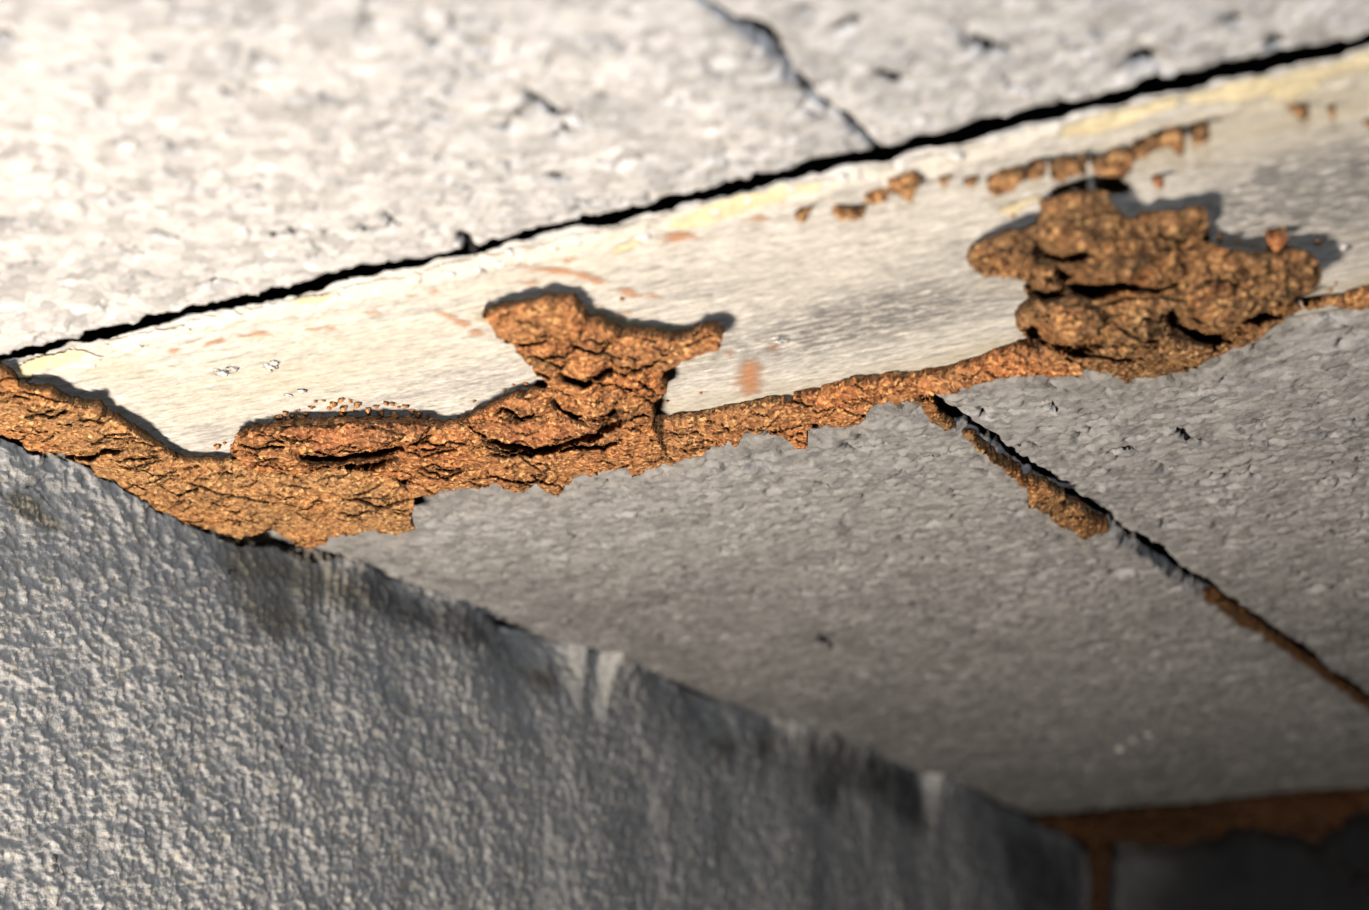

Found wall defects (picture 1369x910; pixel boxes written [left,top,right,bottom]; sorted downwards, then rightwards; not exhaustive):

crack [837,15,862,28]
crack [740,16,783,52]
crack [970,34,1009,53]
crack [1138,47,1163,66]
crack [800,76,819,90]
crack [876,69,909,82]
crack [487,88,584,133]
crack [358,211,402,231]
crack [268,226,295,238]
crack [456,230,478,255]
crack [1176,427,1205,441]